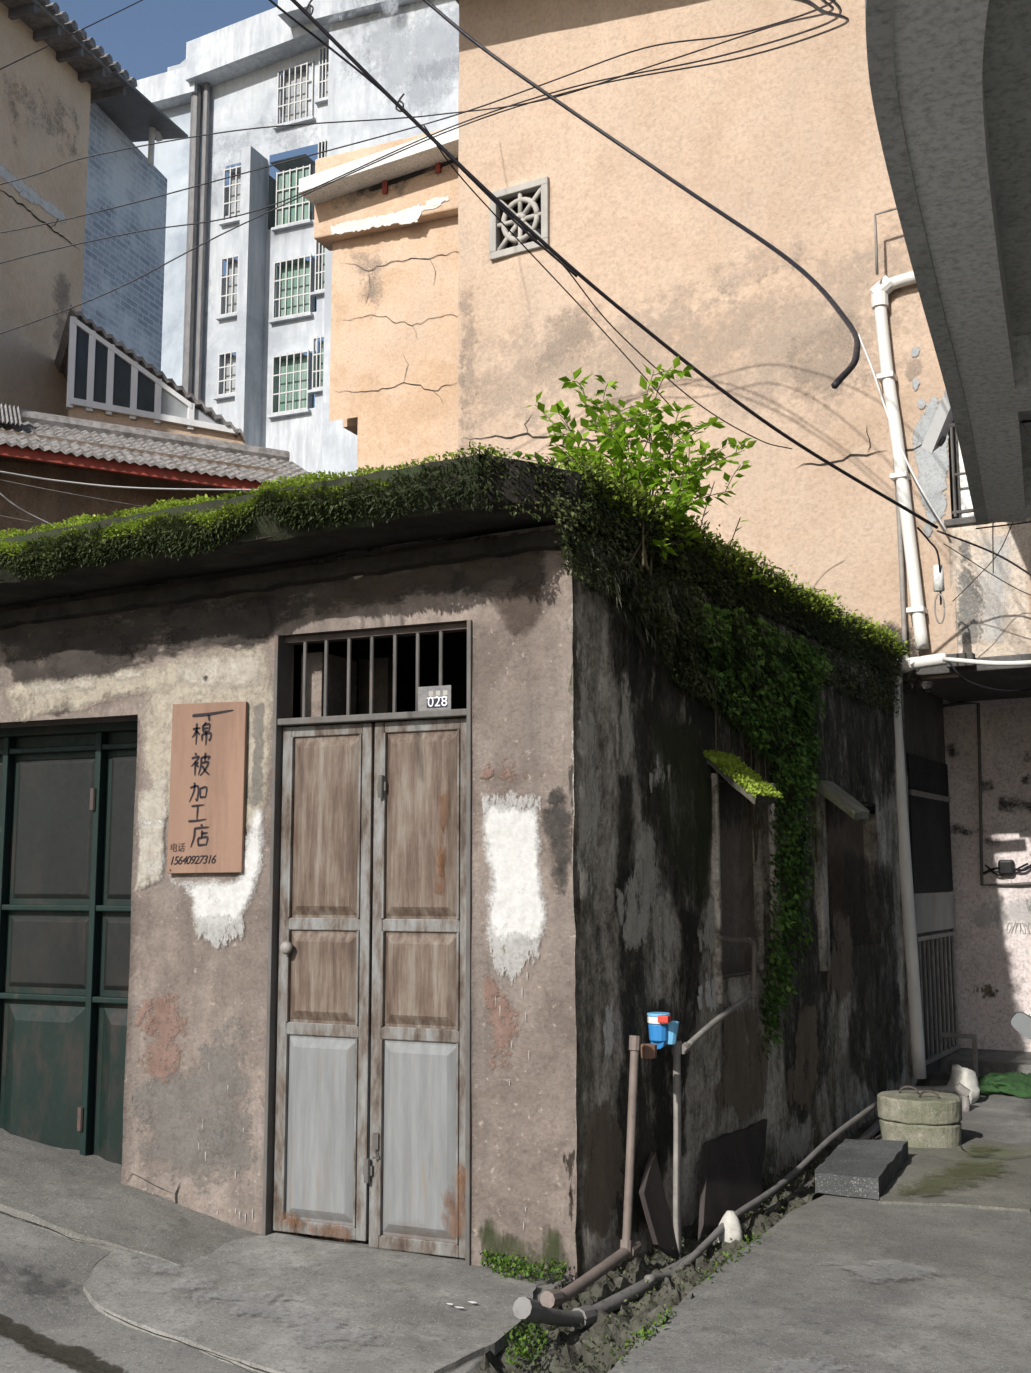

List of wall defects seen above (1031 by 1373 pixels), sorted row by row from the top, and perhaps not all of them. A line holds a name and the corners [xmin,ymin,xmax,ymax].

peeling [426,196,449,207]
crack [334,251,457,403]
crack [462,416,675,449]
flaking render [906,346,949,537]
leakage [954,538,1008,645]
peeling [0,649,274,828]
leakage [605,566,931,1237]